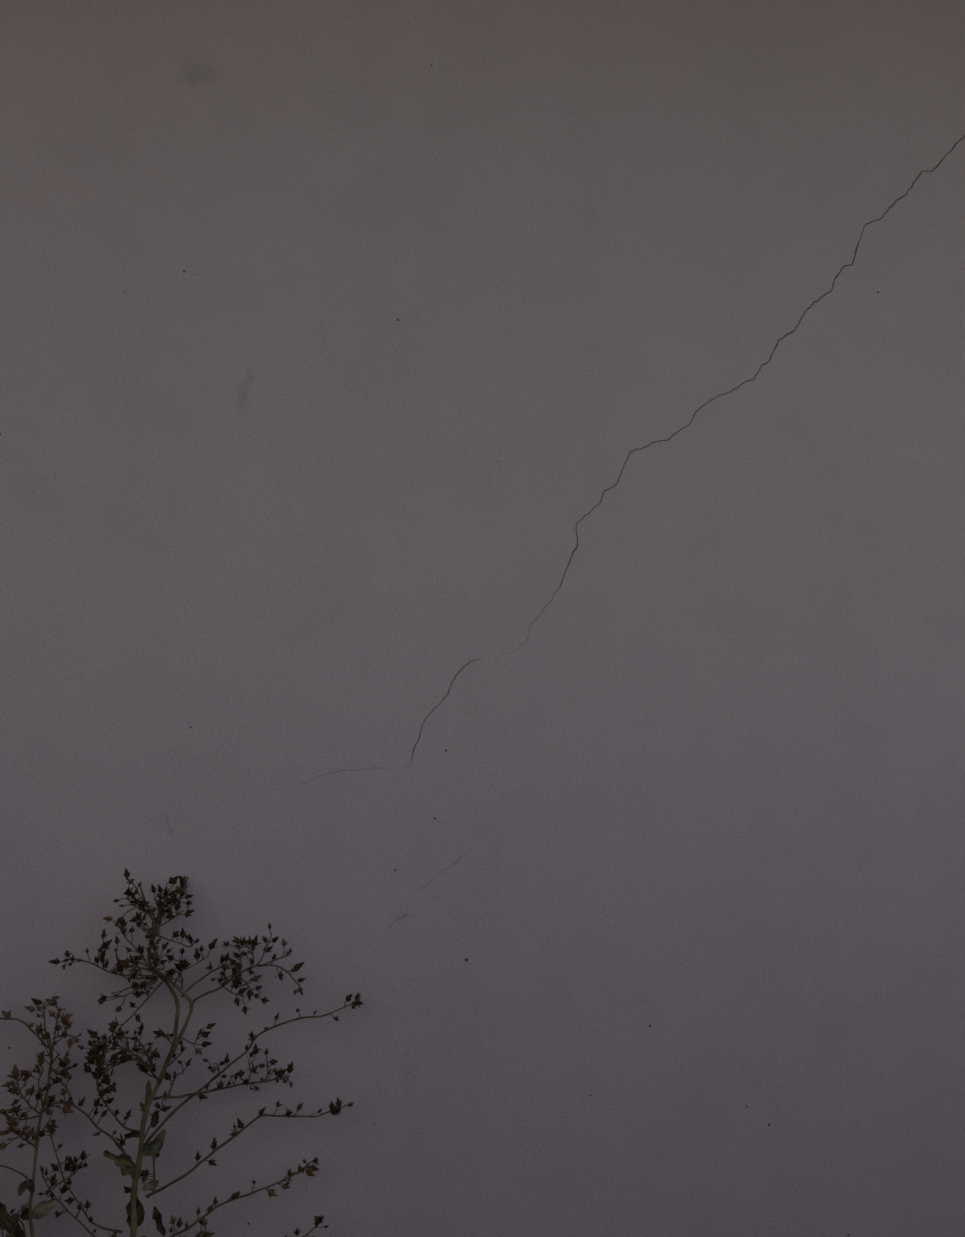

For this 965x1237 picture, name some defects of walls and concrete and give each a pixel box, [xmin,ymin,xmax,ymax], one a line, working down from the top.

crack [529,136,965,629]
crack [411,658,480,761]